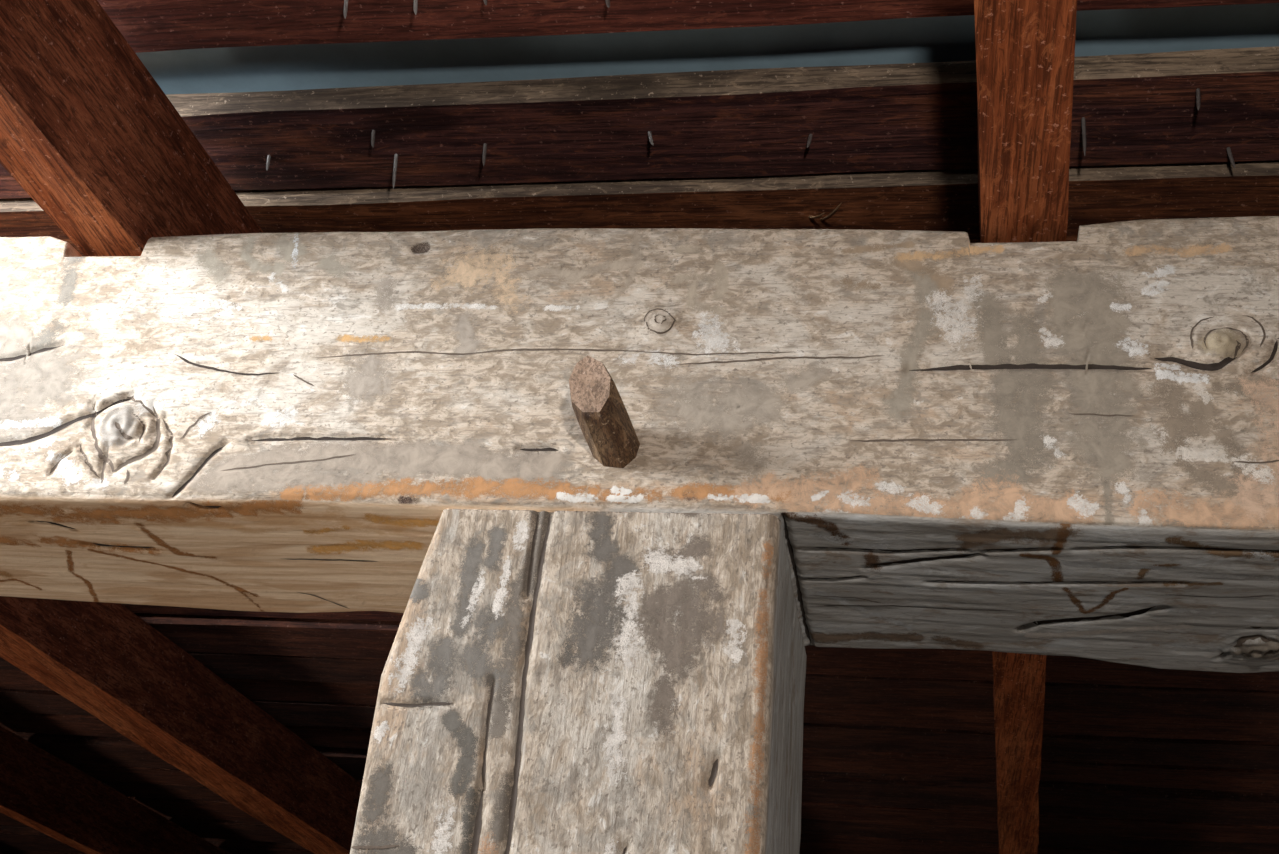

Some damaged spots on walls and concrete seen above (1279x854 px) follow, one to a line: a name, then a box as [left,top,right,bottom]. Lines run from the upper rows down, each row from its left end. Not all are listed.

crack [0,345,63,361]
crack [173,338,1279,386]
crack [0,396,134,446]
crack [37,521,155,548]
crack [289,556,378,564]
crack [1103,544,1279,552]
crack [804,547,1270,611]
crack [470,514,550,854]
crack [384,700,454,708]